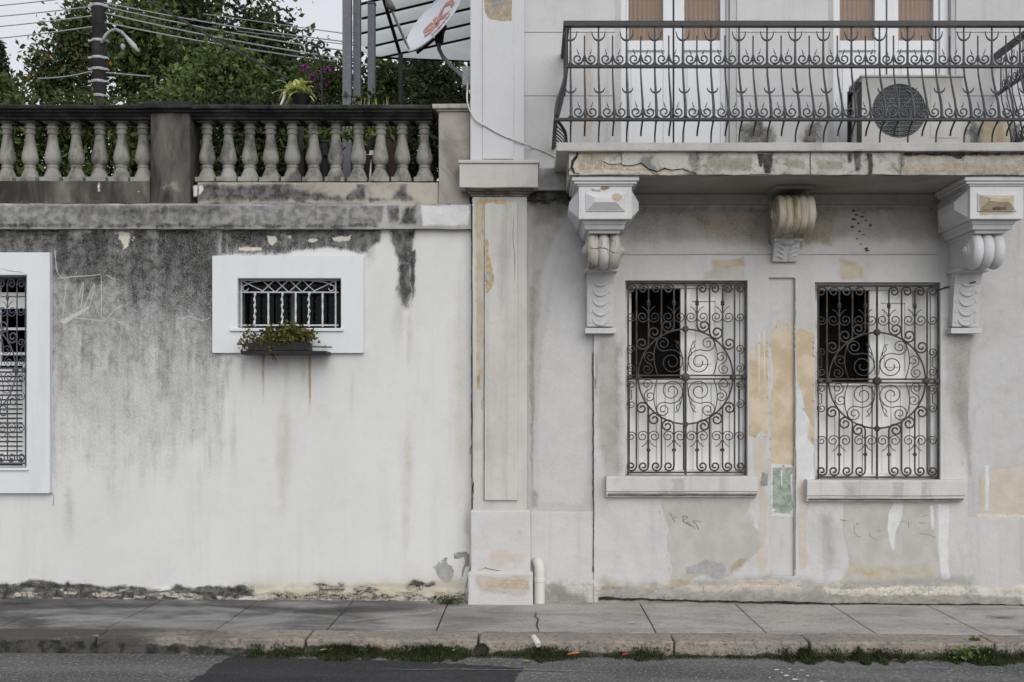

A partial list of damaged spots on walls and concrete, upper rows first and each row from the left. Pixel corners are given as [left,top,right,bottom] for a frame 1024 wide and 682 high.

spalling [484,0,512,21]
crack [568,152,579,177]
spalling [903,152,1024,175]
peeling [115,230,135,255]
peeling [238,235,291,252]
peeling [474,199,507,390]
damp [0,180,418,554]
peeling [668,320,815,596]
damp [0,557,468,623]
spalling [433,552,530,598]